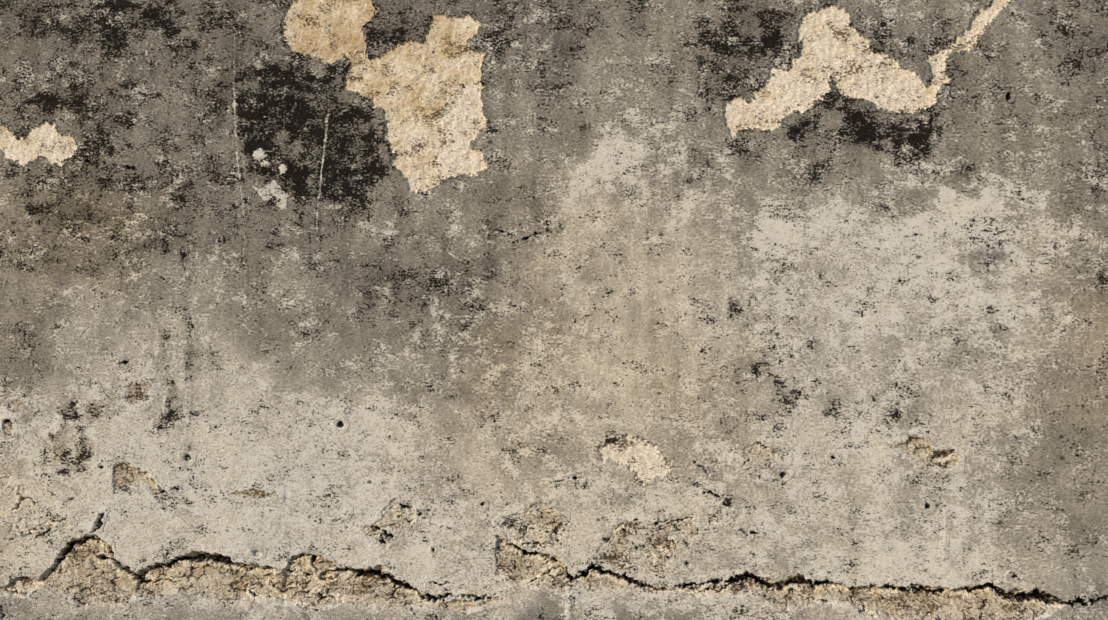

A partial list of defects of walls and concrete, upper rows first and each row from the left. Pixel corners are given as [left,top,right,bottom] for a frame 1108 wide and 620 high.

peeling [0,117,80,171]
leakage [24,67,107,149]
leakage [0,160,153,261]
leakage [0,0,190,72]
leakage [227,40,531,367]
peeling [278,0,492,198]
leakage [666,0,963,200]
peeling [716,0,1013,143]
spalling [93,455,177,518]
spalling [0,492,1075,620]
crack [0,436,1108,620]
peeling [592,430,677,489]